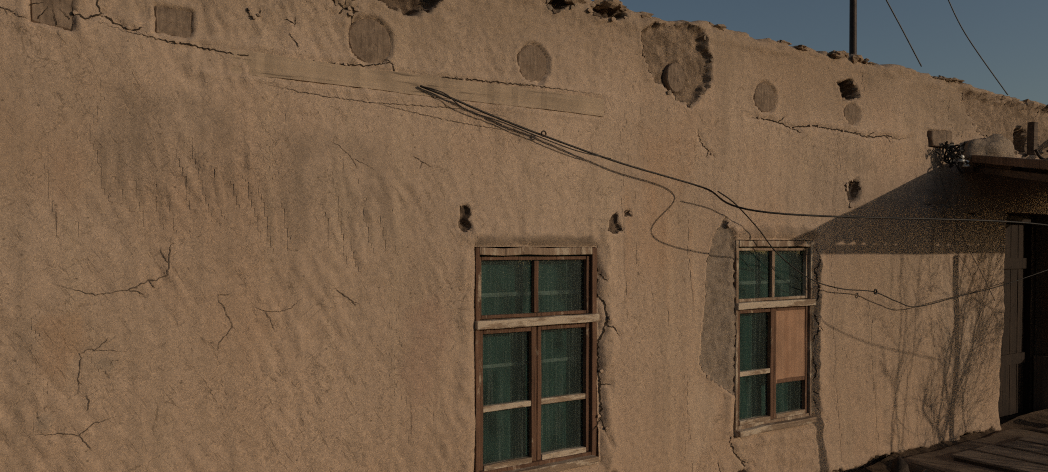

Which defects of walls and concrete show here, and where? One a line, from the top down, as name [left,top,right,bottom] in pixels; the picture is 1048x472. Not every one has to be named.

crack [73,0,249,56]
crack [287,16,395,71]
crack [437,76,592,93]
spalling [546,0,596,14]
spalling [641,21,713,108]
crack [752,116,909,144]
peeling [458,204,472,232]
crack [59,237,172,298]
crack [593,268,620,444]
peeling [699,220,736,395]
crack [813,249,827,423]
crack [37,337,127,450]